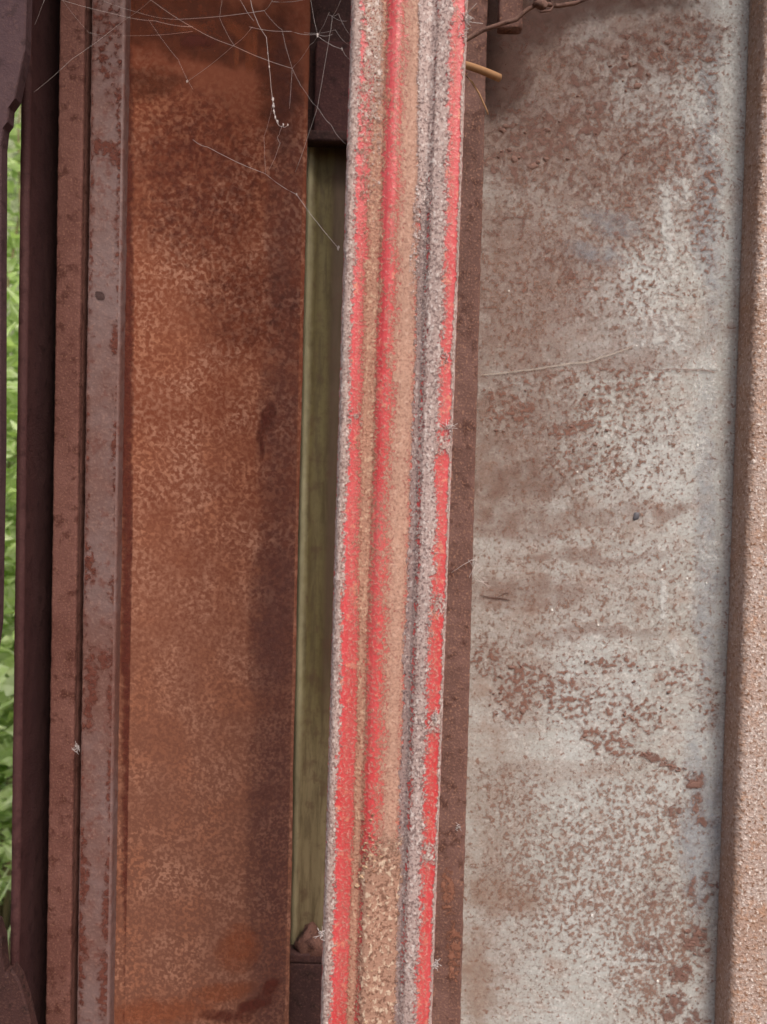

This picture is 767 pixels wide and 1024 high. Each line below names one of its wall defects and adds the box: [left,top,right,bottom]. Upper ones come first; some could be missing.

corrosion [78,813,110,1020]
corrosion [82,614,113,818]
corrosion [91,0,300,301]
peeling [320,0,386,1024]
peeling [397,0,468,1024]
corrosion [441,0,739,1024]